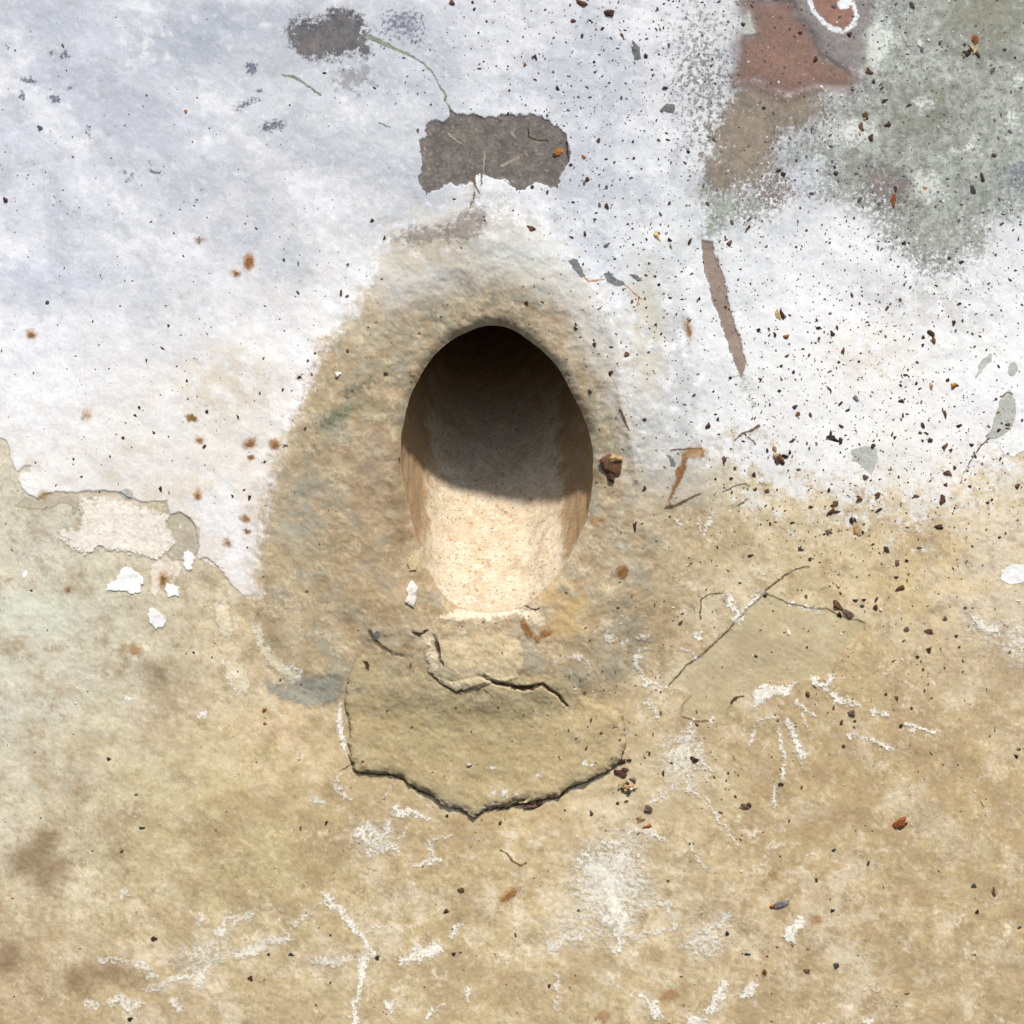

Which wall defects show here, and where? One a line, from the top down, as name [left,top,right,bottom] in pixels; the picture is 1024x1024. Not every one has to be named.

spalling [418,110,586,195]
peeling [15,489,218,629]
crack [765,566,810,591]
crack [368,630,568,707]
damp [810,674,890,717]
damp [748,682,817,808]
crack [340,753,624,818]
damp [84,892,381,1024]
damp [398,923,464,966]
damp [544,823,734,960]
damp [780,915,806,944]
damp [687,979,759,1024]